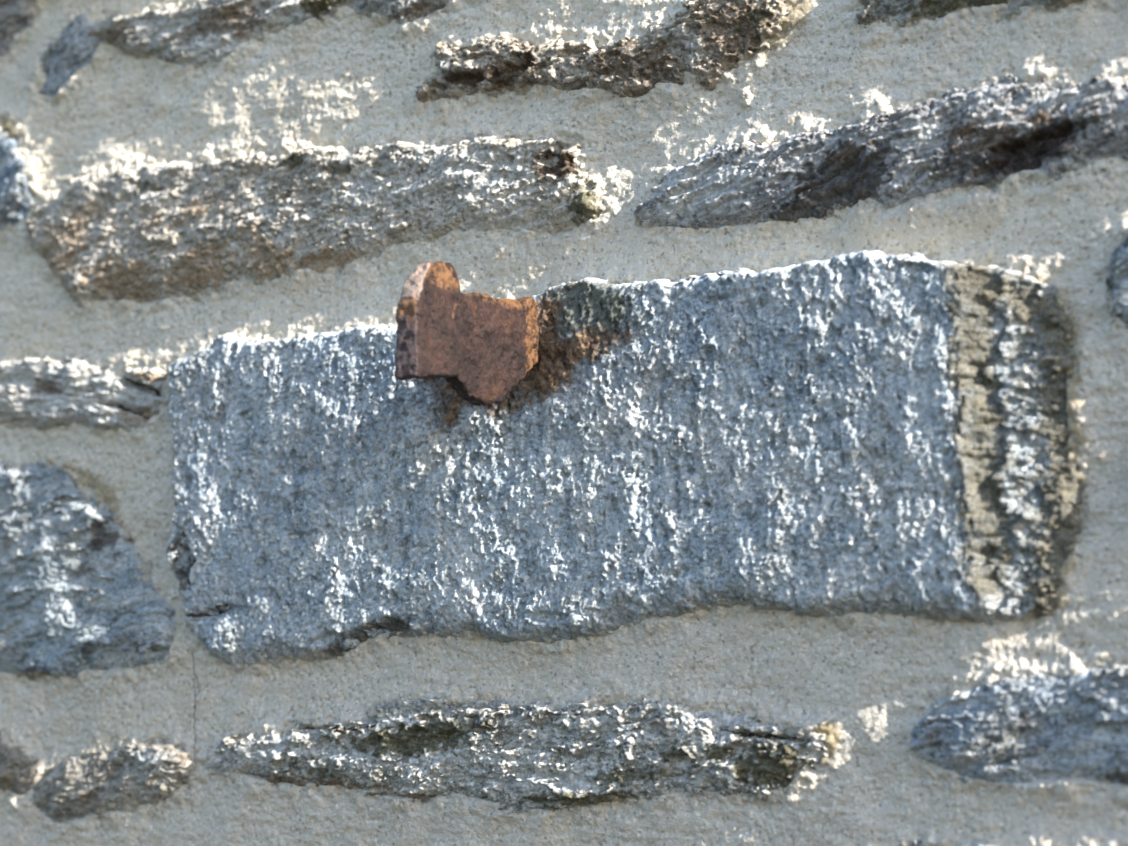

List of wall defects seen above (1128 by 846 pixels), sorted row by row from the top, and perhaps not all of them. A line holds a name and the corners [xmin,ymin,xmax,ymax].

corrosion [423,296,633,426]